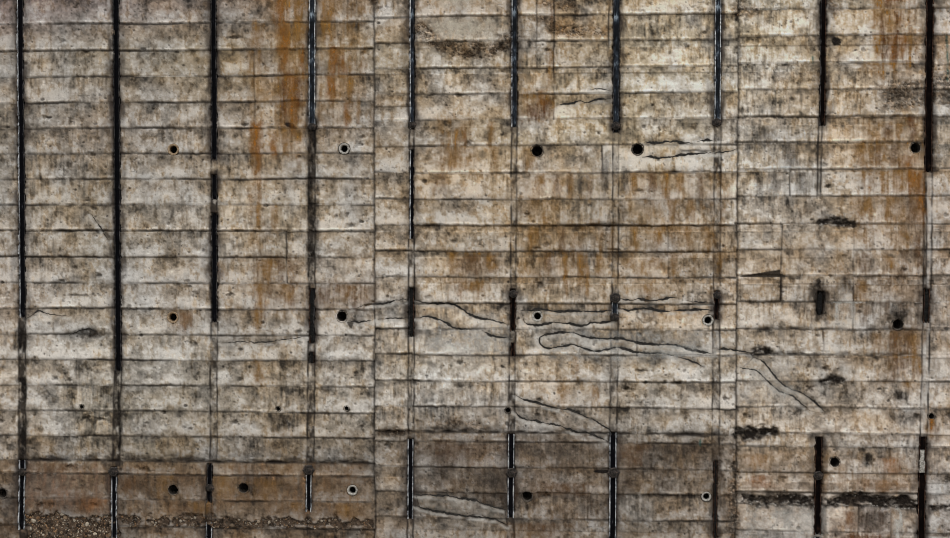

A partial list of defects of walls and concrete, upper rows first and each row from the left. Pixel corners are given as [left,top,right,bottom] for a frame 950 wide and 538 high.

spalling [415,23,512,59]
corrosion [874,0,917,80]
corrosion [271,0,306,153]
corrosion [251,123,261,170]
corrosion [858,118,925,265]
crack [351,297,825,412]
crack [516,395,612,442]
spalling [25,511,374,538]
crack [416,494,506,525]